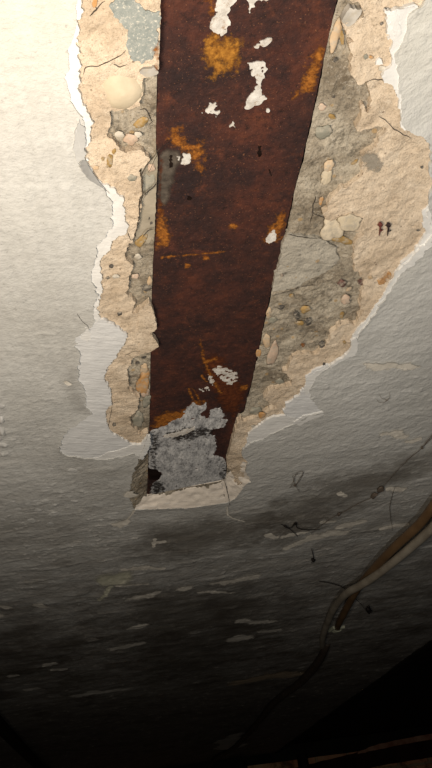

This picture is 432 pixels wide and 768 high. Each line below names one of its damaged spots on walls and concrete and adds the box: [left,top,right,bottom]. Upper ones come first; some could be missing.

rust [203,33,240,79]
rust [294,47,325,97]
rust [168,127,205,172]
rust [156,200,170,248]
rust [264,214,286,243]
spalling [60,0,432,528]
rust [200,343,248,417]
rust [152,388,205,428]